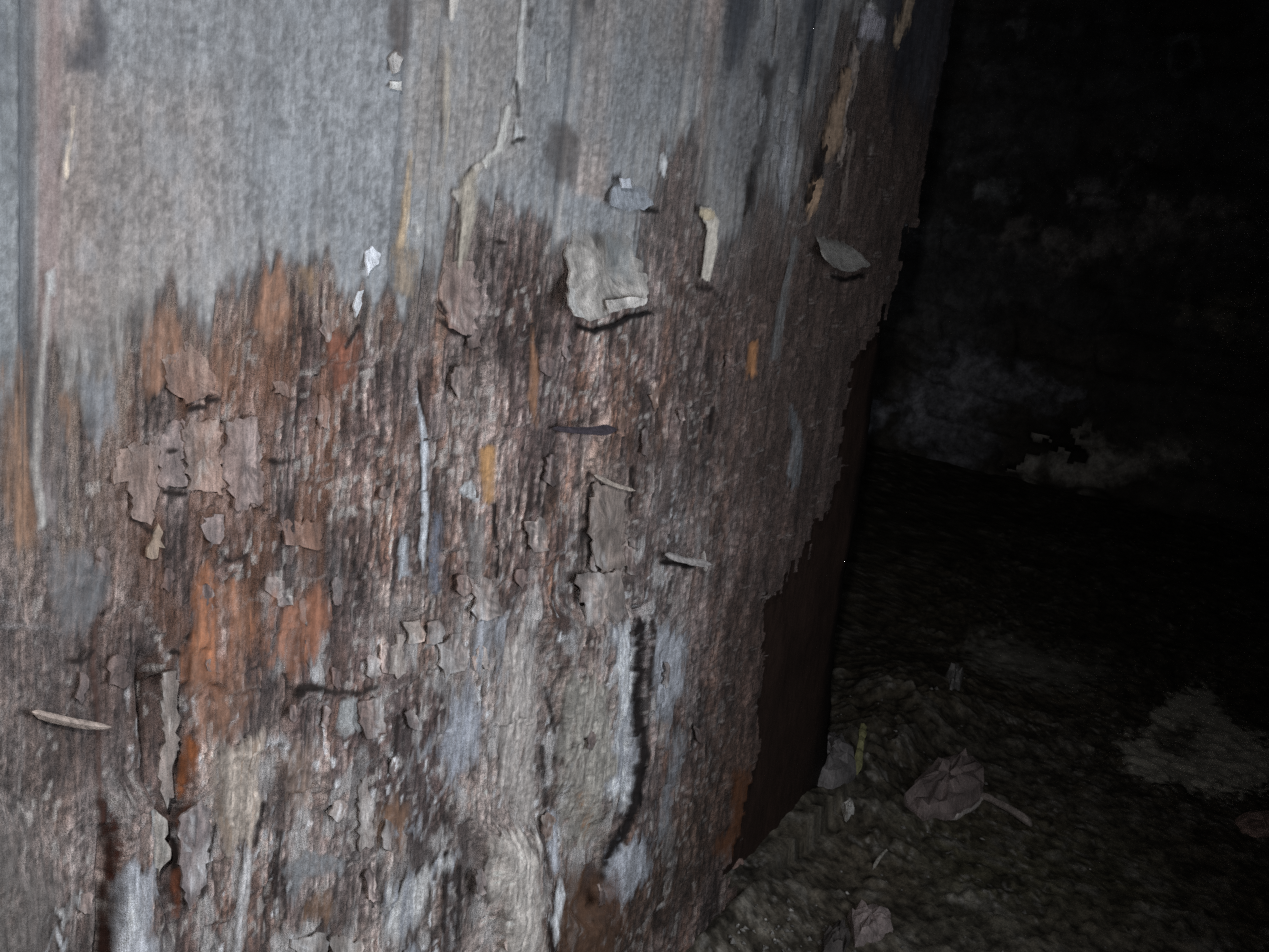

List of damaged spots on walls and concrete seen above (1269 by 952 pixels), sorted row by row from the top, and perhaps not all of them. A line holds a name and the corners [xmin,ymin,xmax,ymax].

peeling [352,290,364,318]
peeling [364,246,381,276]
peeling [560,235,653,362]
peeling [700,207,722,299]
peeling [111,340,265,592]
peeling [456,574,503,621]
peeling [574,481,639,627]
peeling [151,670,213,909]
peeling [328,774,396,852]
crack [596,617,656,884]
peeling [289,932,364,952]
crack [548,918,556,952]